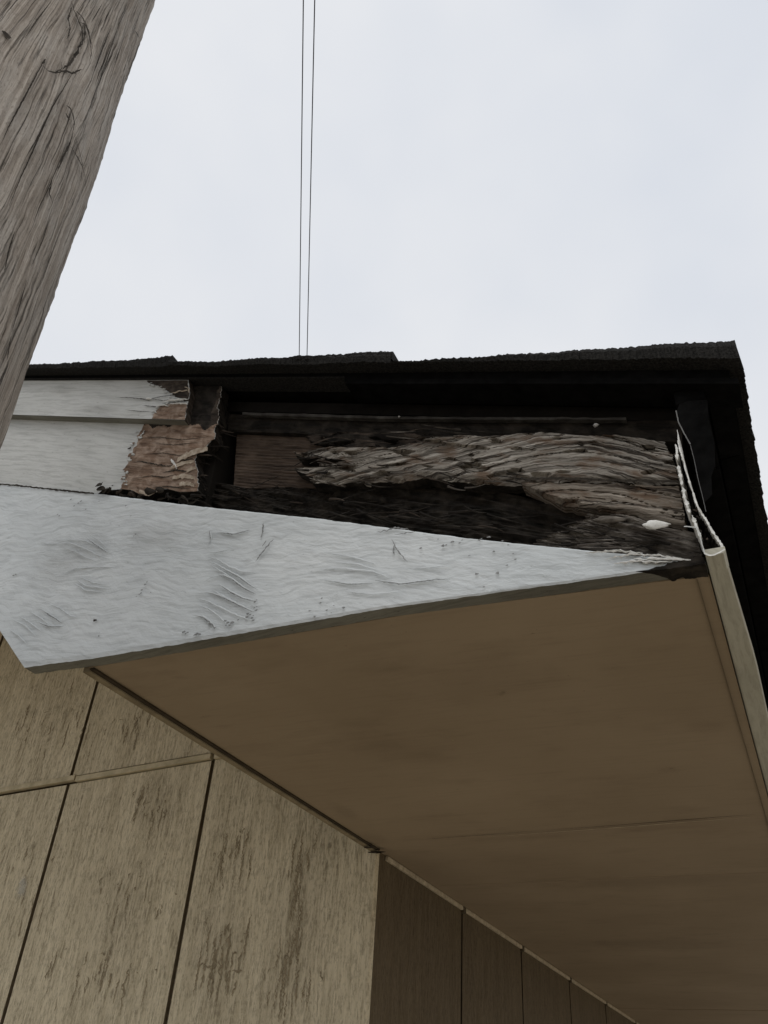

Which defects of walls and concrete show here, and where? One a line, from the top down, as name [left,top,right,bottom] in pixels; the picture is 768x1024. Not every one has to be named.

peeling [120,380,221,496]
peeling [674,431,725,556]
peeling [585,549,690,564]